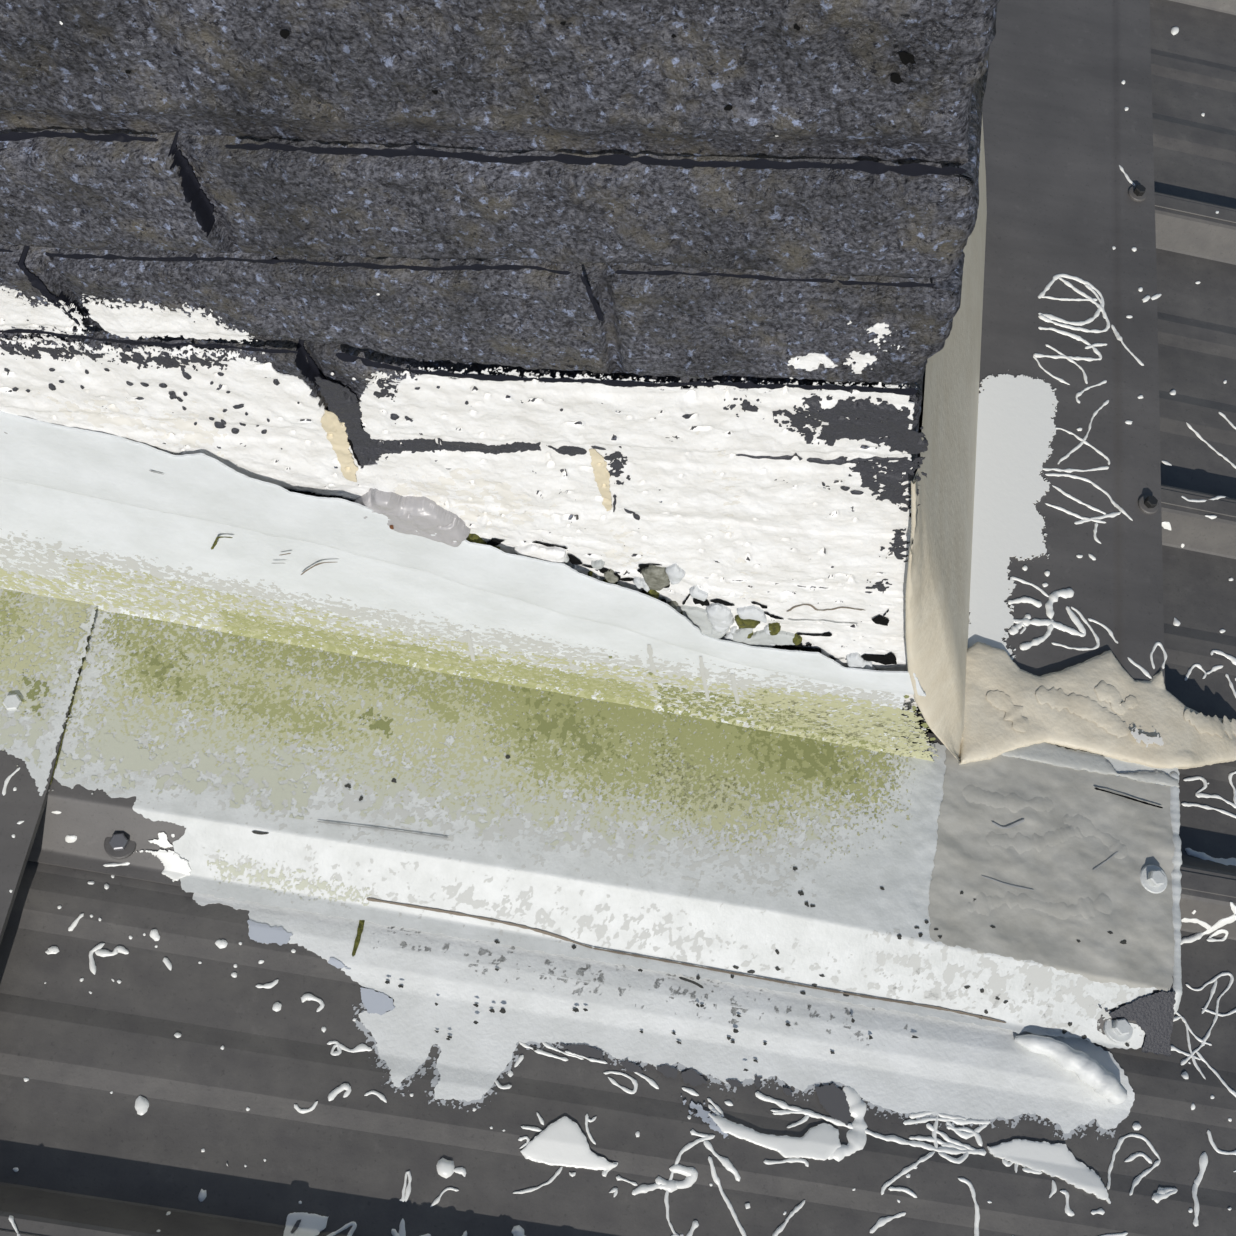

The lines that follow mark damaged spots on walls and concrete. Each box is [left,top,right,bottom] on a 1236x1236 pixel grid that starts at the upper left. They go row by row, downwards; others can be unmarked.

peeling [0,339,228,410]
peeling [194,391,270,434]
peeling [373,379,411,421]
crack [347,439,361,466]
peeling [723,390,928,512]
crack [287,489,354,502]
peeling [591,446,640,520]
crack [211,536,233,550]
crack [272,553,335,575]
peeling [879,528,910,562]
crack [532,541,897,670]
leakage [0,526,1147,1045]